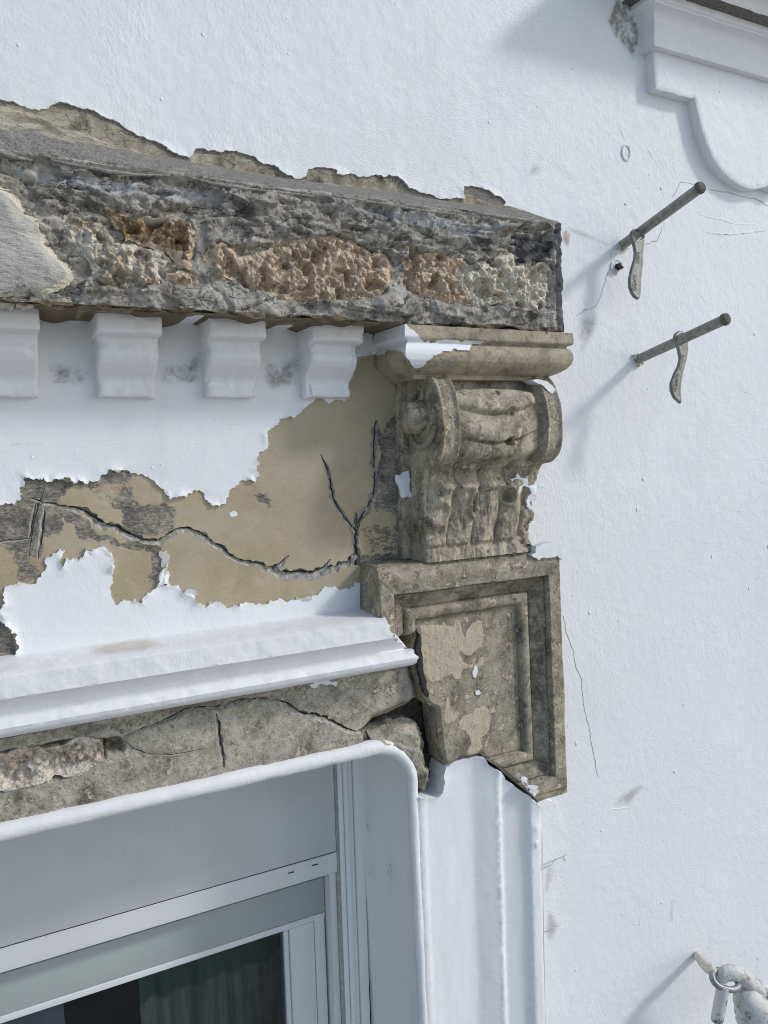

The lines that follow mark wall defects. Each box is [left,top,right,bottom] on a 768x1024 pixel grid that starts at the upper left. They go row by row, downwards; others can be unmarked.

spalling [63,207,551,328]
crack [0,420,378,582]
peeling [0,355,412,608]
peeling [0,621,19,656]
crack [122,697,370,768]